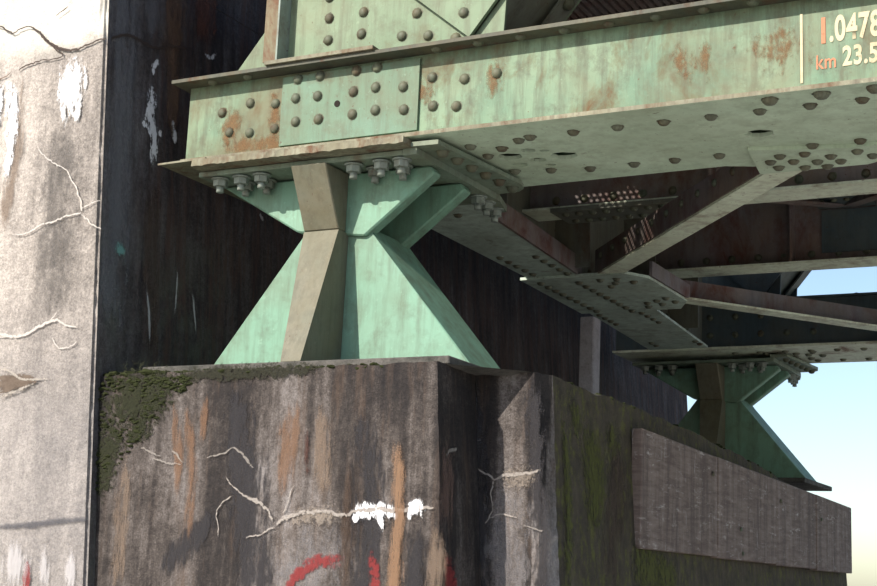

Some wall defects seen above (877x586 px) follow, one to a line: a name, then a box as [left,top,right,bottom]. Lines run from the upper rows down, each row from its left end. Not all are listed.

crack [0,26,196,80]
damp [56,57,88,125]
damp [0,82,19,178]
damp [100,0,162,312]
rust [222,113,279,152]
crack [12,146,101,235]
crack [0,314,78,349]
spalling [0,368,45,398]
damp [223,391,396,586]
crack [216,478,434,538]
damp [407,499,424,519]
crack [479,465,542,532]